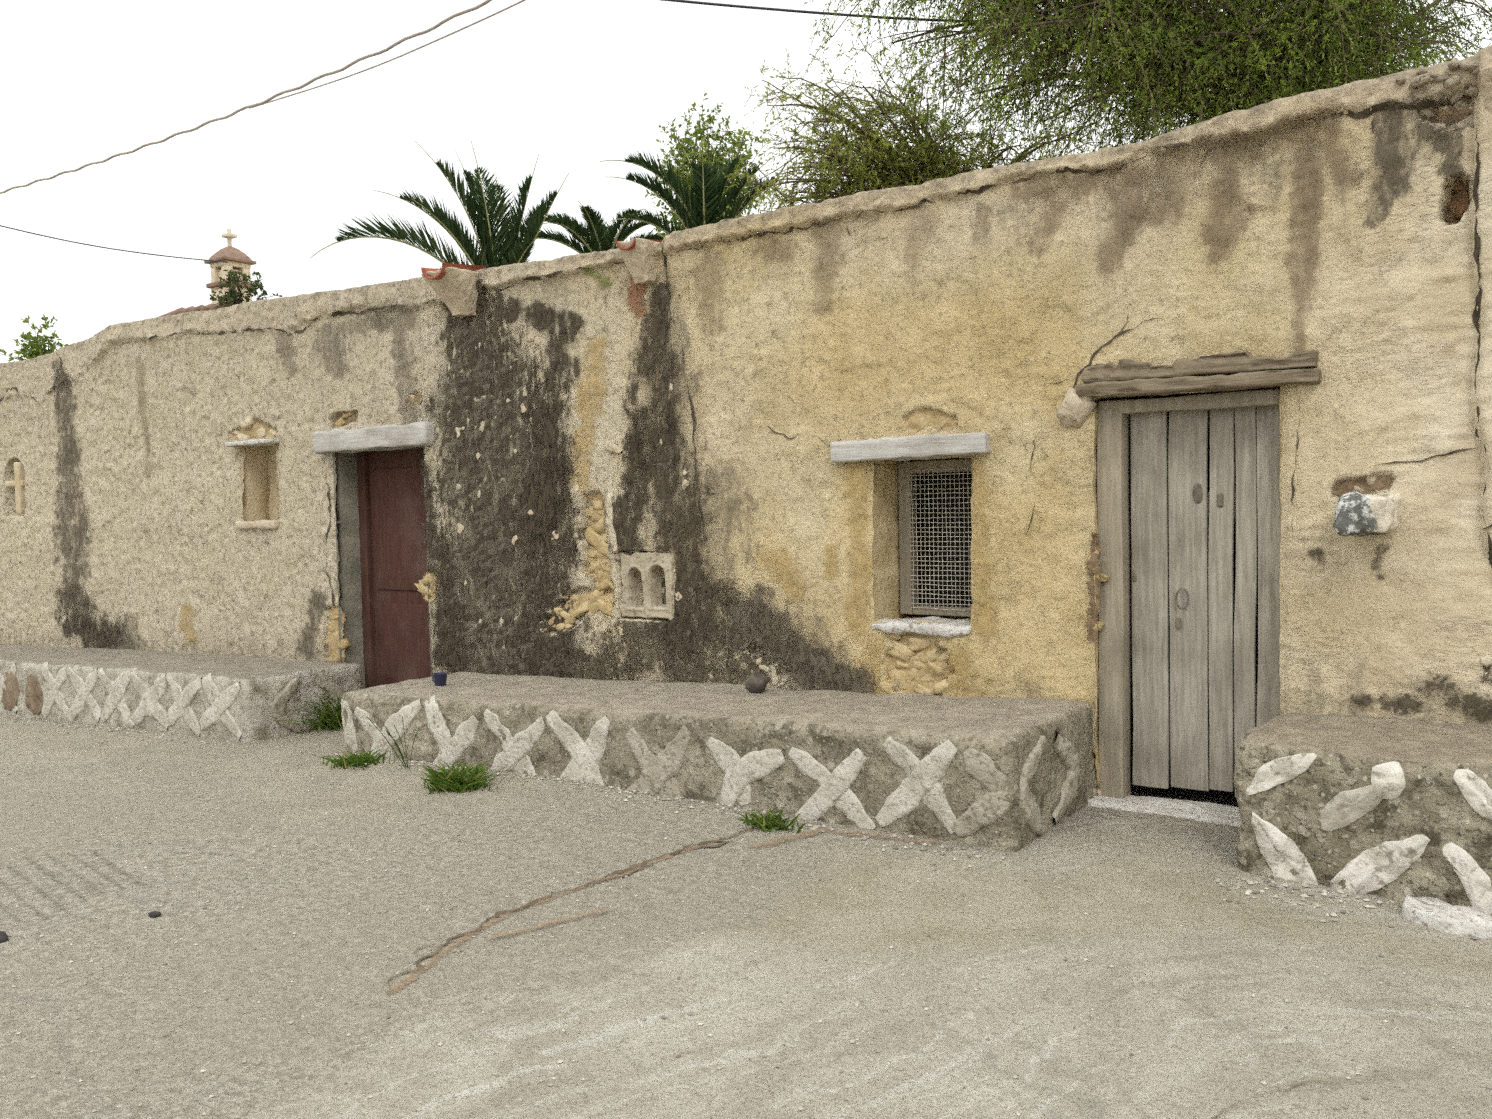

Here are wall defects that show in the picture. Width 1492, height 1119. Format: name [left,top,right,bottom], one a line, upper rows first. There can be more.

crack [661,98,1492,566]
water stain [1009,92,1464,353]
water stain [51,360,148,650]
spalling [545,484,615,633]
water stain [421,279,893,694]
spalling [879,621,951,696]
water stain [1351,665,1492,723]